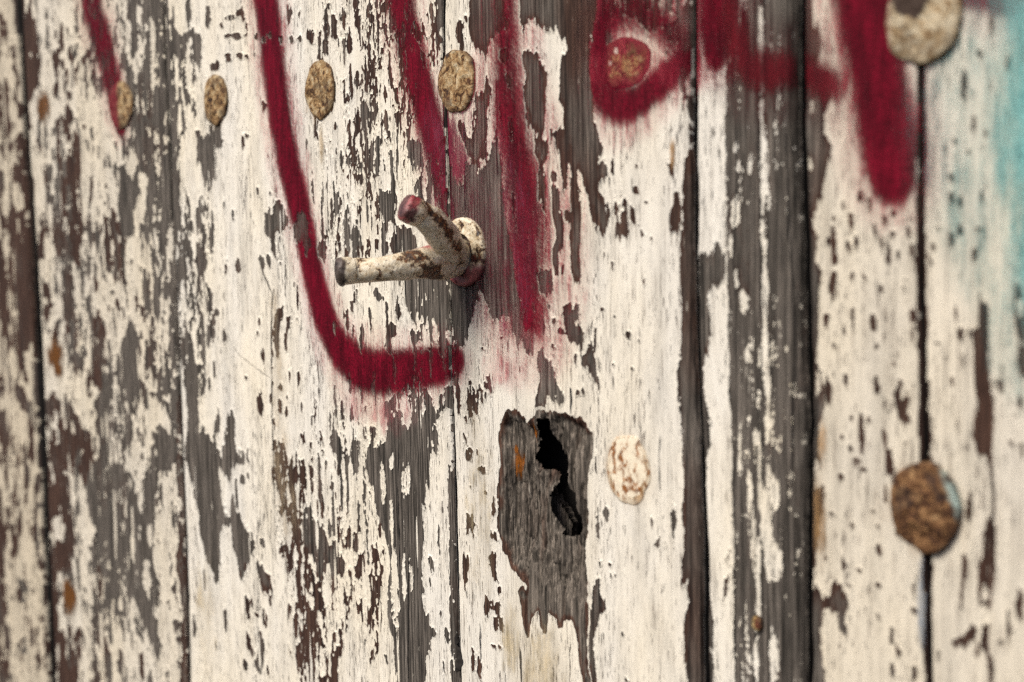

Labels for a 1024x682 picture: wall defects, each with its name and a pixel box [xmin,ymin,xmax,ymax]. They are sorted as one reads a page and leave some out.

peeling [0,0,695,682]
peeling [649,0,921,682]
peeling [927,373,935,455]
peeling [926,170,986,267]
peeling [952,13,995,155]
peeling [936,280,1024,682]